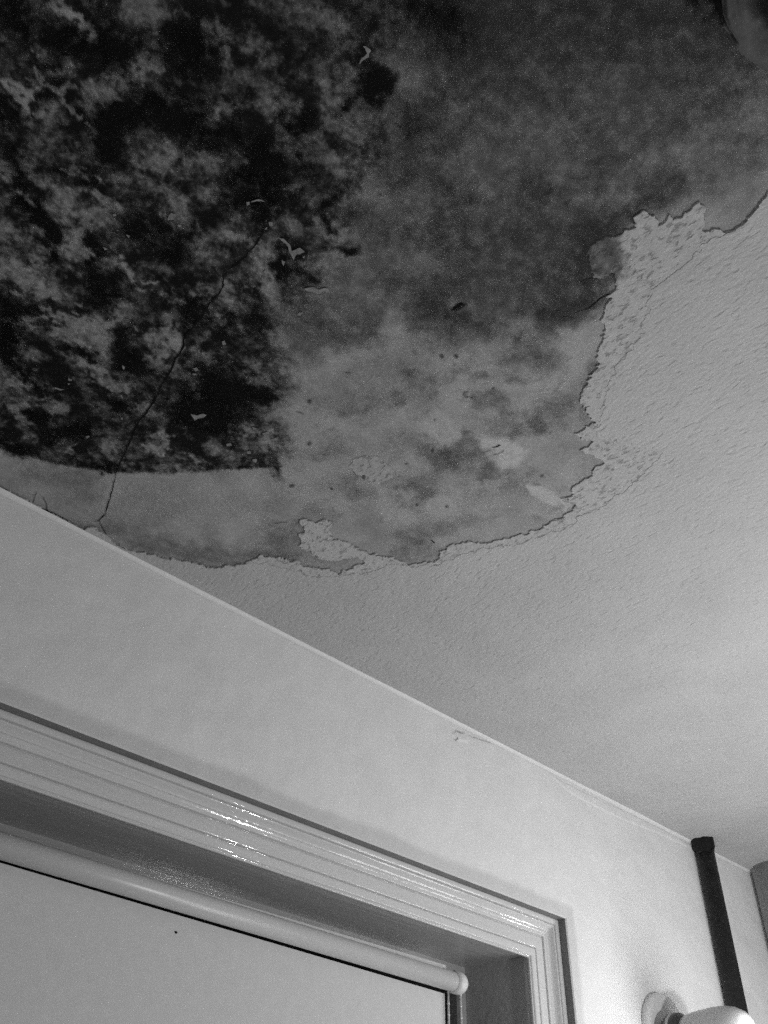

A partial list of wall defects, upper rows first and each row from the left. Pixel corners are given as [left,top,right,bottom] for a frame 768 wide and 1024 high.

crack [94,224,269,535]
water stain [0,0,737,475]
peeling [0,0,768,578]